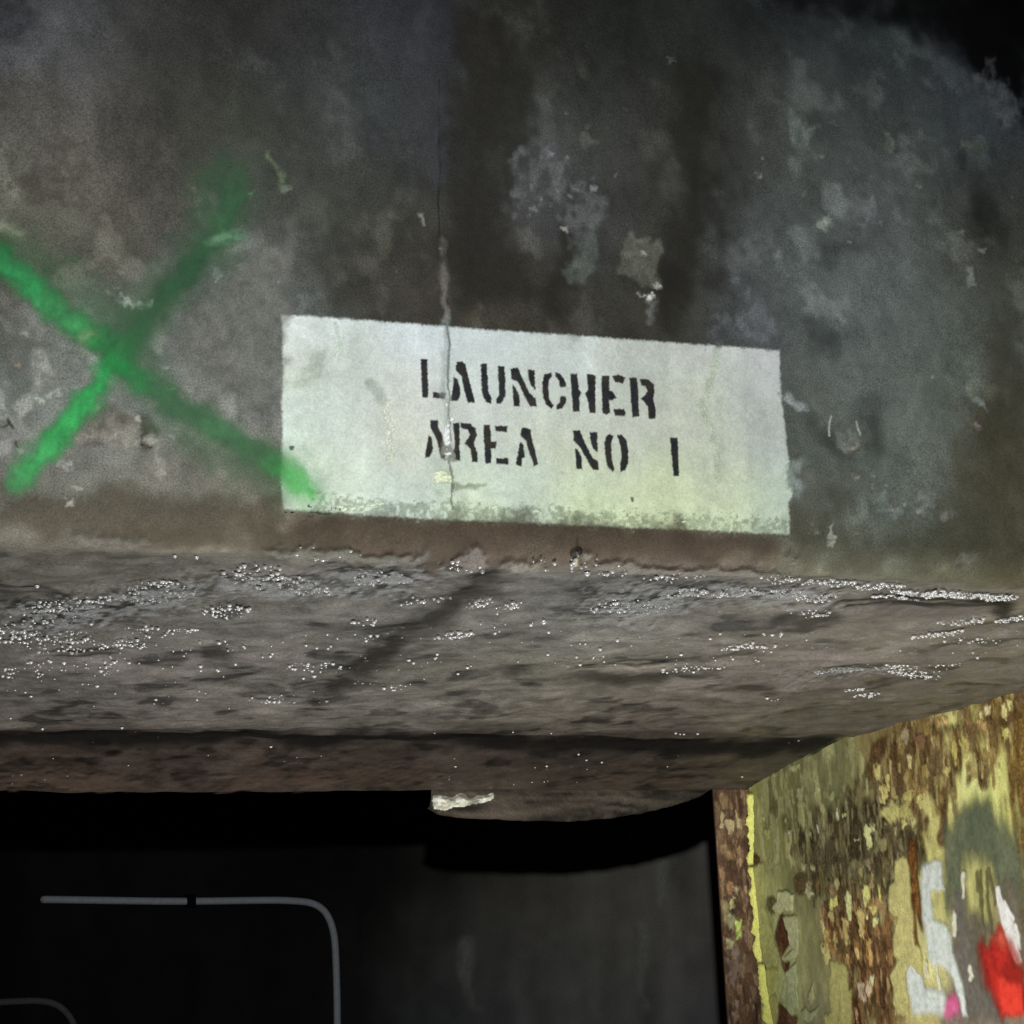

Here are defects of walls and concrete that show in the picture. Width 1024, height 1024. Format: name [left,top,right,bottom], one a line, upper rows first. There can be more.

peeling [509,141,608,284]
peeling [618,233,663,326]
crack [439,237,457,509]
leakage [0,489,278,551]
leakage [0,548,444,637]
leakage [455,548,488,574]
leakage [501,562,540,574]
leakage [583,562,856,630]
leakage [783,668,897,687]
leakage [0,730,837,758]
peeling [715,737,870,1024]
peeling [888,856,923,1016]